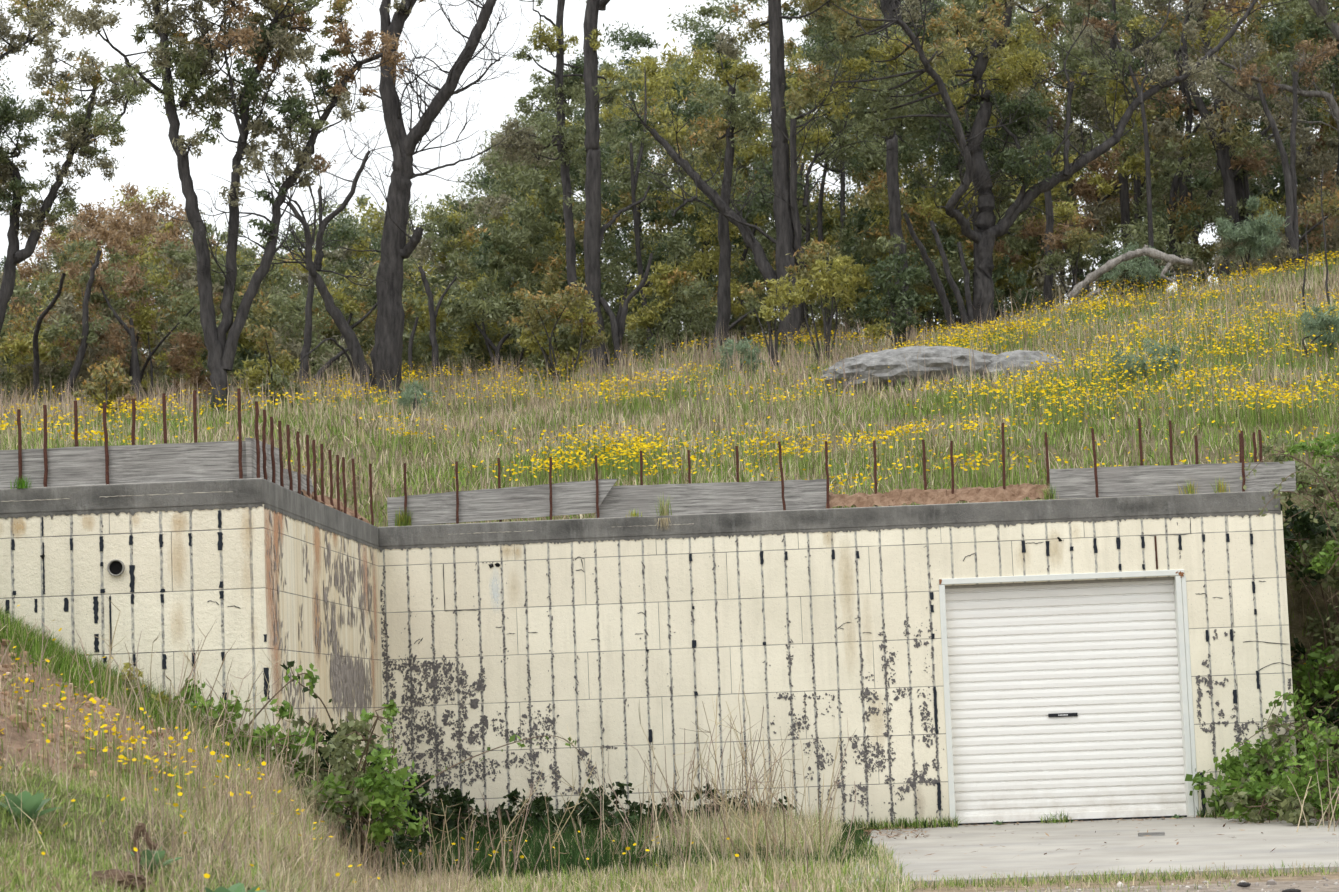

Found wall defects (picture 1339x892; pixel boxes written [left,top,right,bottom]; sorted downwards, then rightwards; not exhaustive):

rust [265,511,283,675]
peeling [263,511,655,822]
peeling [665,570,677,805]
peeling [760,530,944,832]